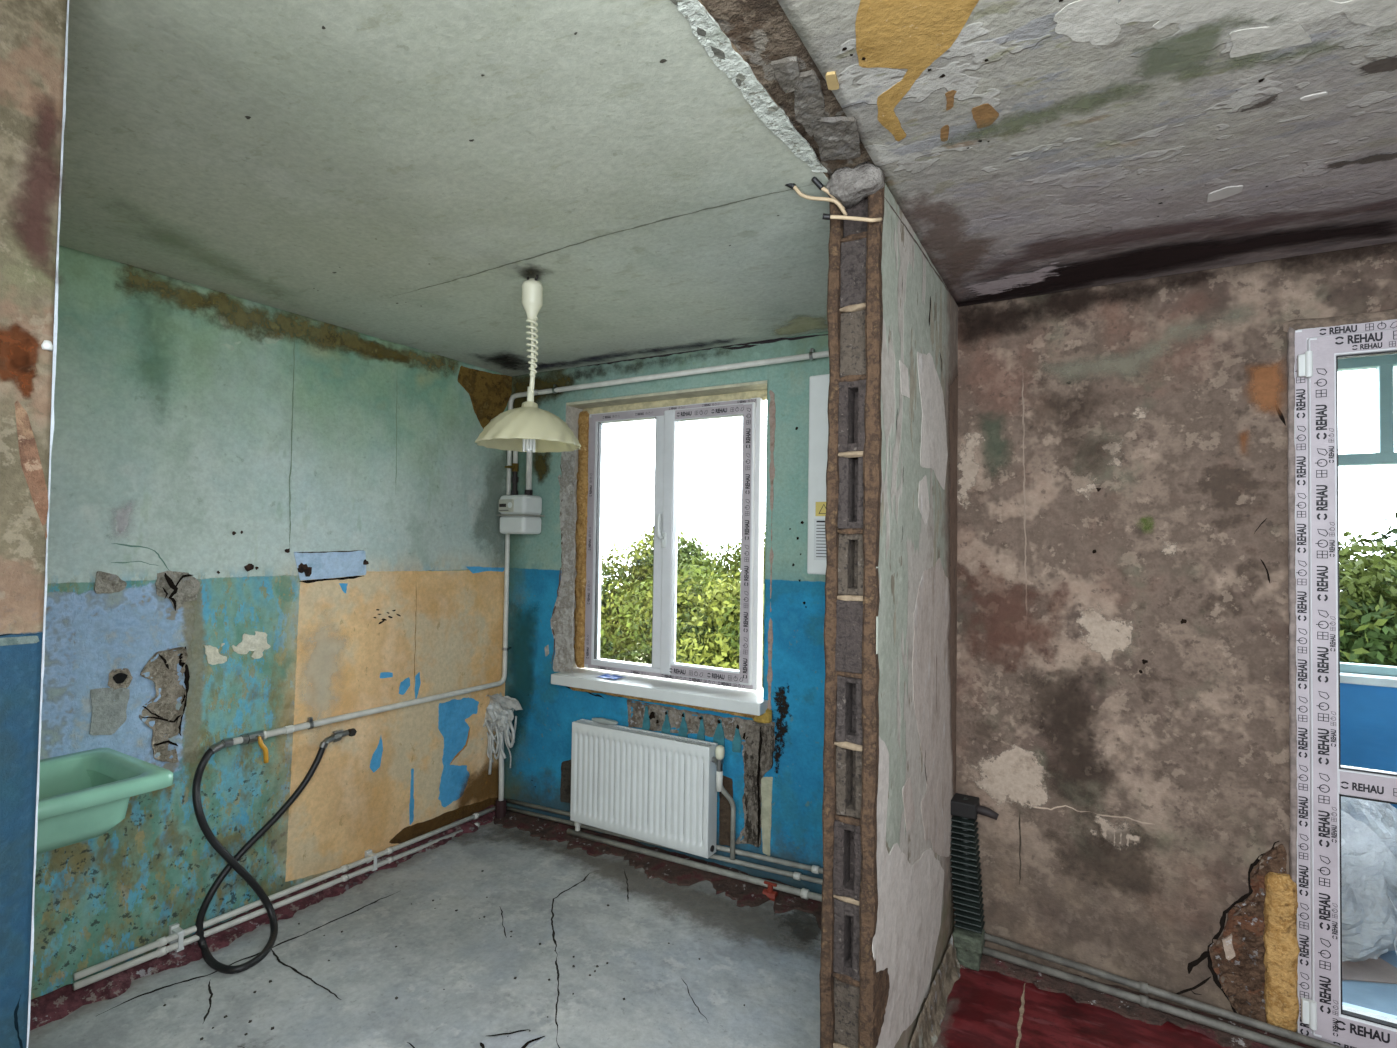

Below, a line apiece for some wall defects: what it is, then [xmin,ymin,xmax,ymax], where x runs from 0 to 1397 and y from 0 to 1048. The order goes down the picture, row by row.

peeling [855,0,979,142]
peeling [1053,0,1397,58]
spalling [1360,55,1397,76]
water stain [913,199,1397,343]
rust [0,324,39,397]
spalling [155,571,200,611]
spalling [89,647,190,763]
spalling [627,699,775,844]
peeling [872,558,954,1048]
peeling [971,744,1048,808]
crack [551,870,598,1048]
spalling [1207,841,1287,1023]